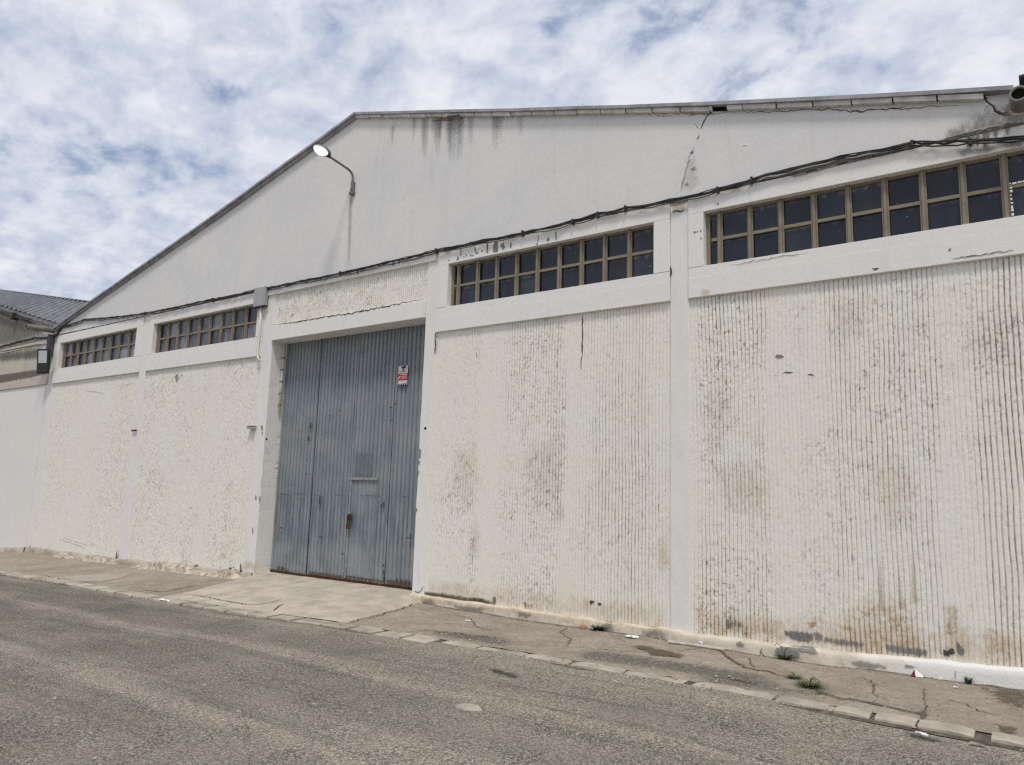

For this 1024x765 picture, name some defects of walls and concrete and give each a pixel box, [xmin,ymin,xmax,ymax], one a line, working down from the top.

crack [637,105,958,189]
mould [425,592,496,605]